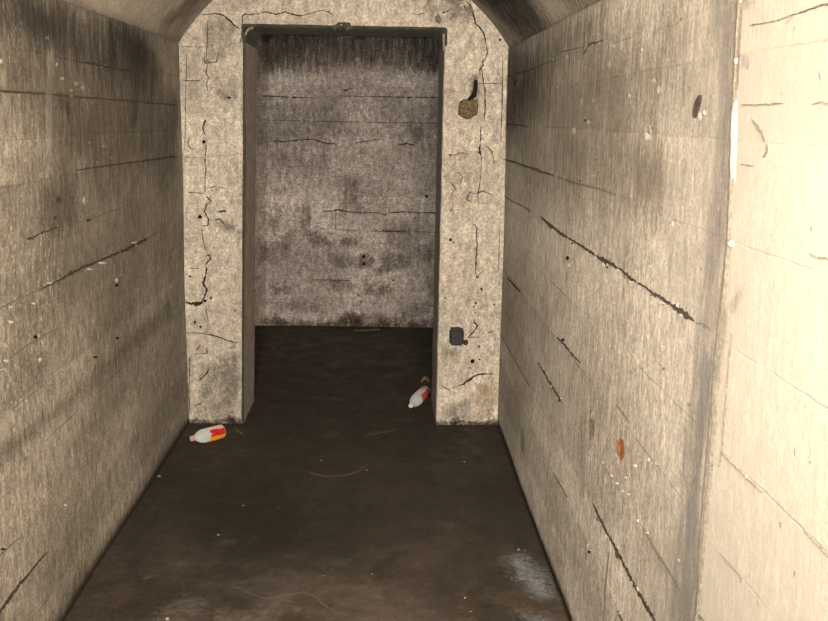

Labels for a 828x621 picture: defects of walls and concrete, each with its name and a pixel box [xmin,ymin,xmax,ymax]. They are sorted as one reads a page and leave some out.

leakage [0,0,176,154]
crack [273,120,434,146]
crack [340,88,438,98]
crack [411,0,616,202]
crack [0,10,333,410]
crack [323,209,435,232]
crack [471,223,520,292]
crack [504,0,828,621]
crack [441,373,493,390]
crack [468,319,563,403]